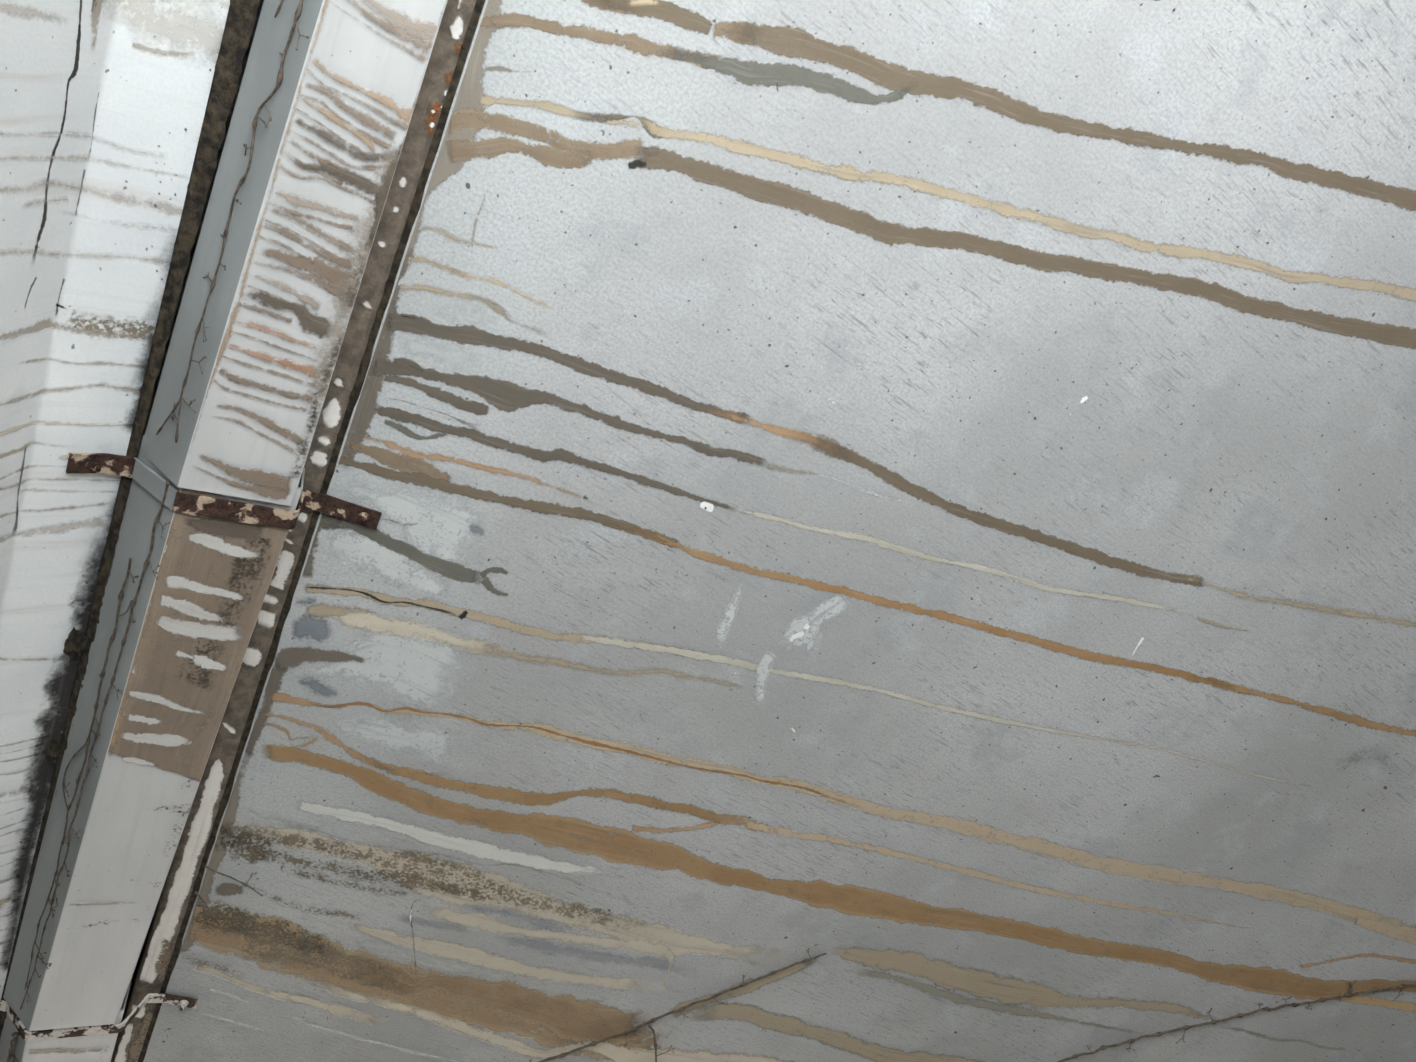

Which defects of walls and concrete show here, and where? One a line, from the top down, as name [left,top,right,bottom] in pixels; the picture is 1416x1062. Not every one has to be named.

water stain [133,44,185,55]
water stain [0,304,153,339]
water stain [341,0,1171,610]
water stain [8,384,136,403]
peeling [258,513,308,628]
water stain [303,513,508,596]
peeling [243,648,262,667]
peeling [140,759,225,983]
water stain [181,599,794,1062]
water stain [698,1003,981,1062]